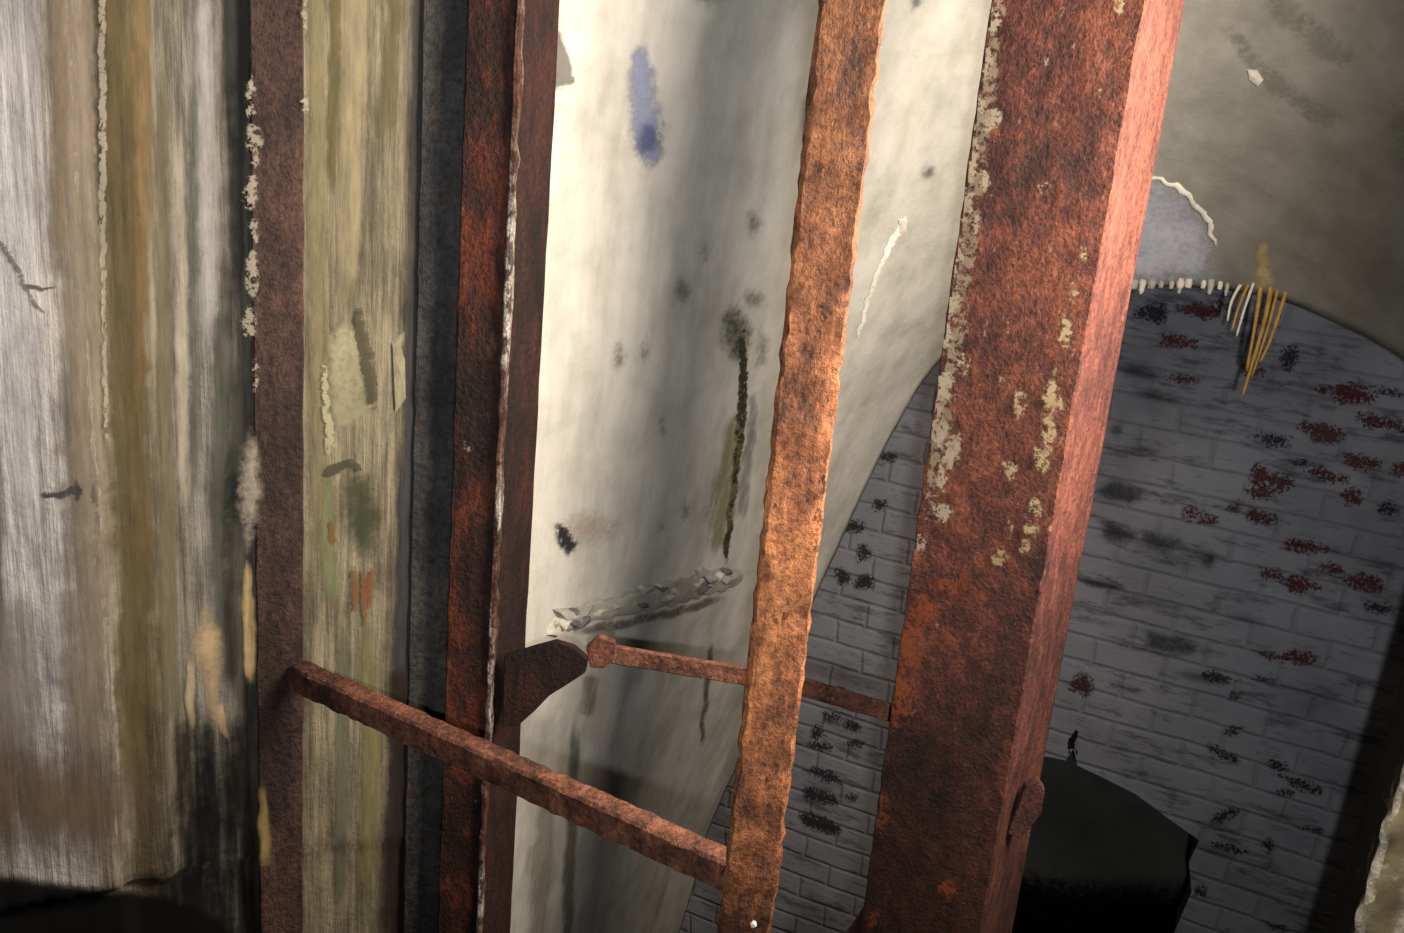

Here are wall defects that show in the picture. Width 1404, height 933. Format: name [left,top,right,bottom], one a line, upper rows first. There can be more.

crack [0,241,55,312]
water stain [724,294,765,359]
peeling [923,0,1006,523]
spalling [1133,176,1217,282]
water stain [0,0,252,933]
peeling [1014,380,1063,473]
peeling [833,499,888,590]
corrosion [242,565,255,677]
flaking render [546,566,742,636]
corrosion [892,574,991,728]
peeling [799,712,866,836]
corrosion [259,792,270,866]